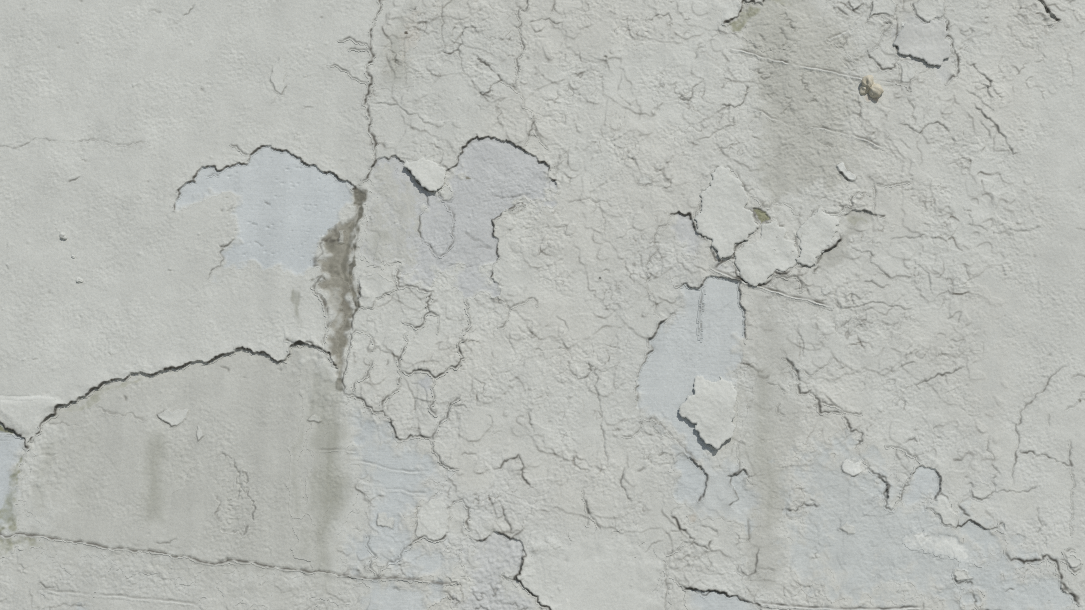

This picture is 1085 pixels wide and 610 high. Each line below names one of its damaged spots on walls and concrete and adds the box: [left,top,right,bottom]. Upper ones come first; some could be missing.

crack [330,0,438,167]
crack [437,0,614,209]
crack [899,97,957,147]
crack [445,498,471,531]
crack [395,267,570,335]
crack [460,450,536,490]
peeling [0,133,1083,610]
crack [581,489,602,531]
crack [569,361,647,503]
crack [755,177,933,417]
crack [894,361,966,412]
crack [980,364,1085,553]